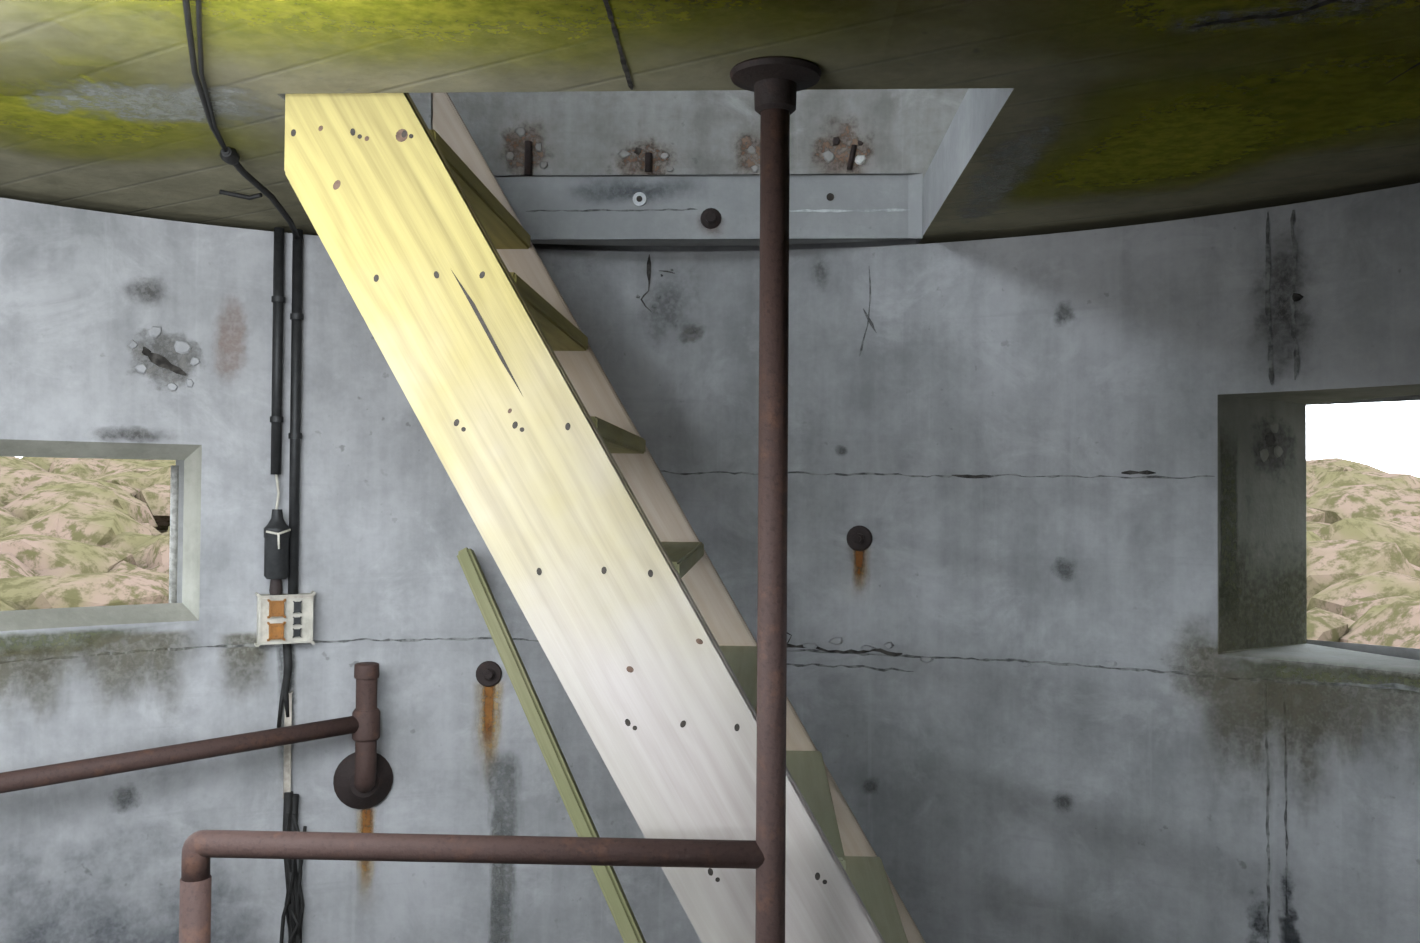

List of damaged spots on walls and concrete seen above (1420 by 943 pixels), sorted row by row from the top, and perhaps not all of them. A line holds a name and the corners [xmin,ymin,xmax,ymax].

crack [1175,0,1369,32]
corrosion [855,551,865,578]
crack [0,637,539,664]
corrosion [481,685,499,752]
corrosion [361,809,372,833]
water stain [489,762,515,836]
crack [787,632,1420,943]
water stain [490,863,514,943]
water stain [1280,879,1300,943]